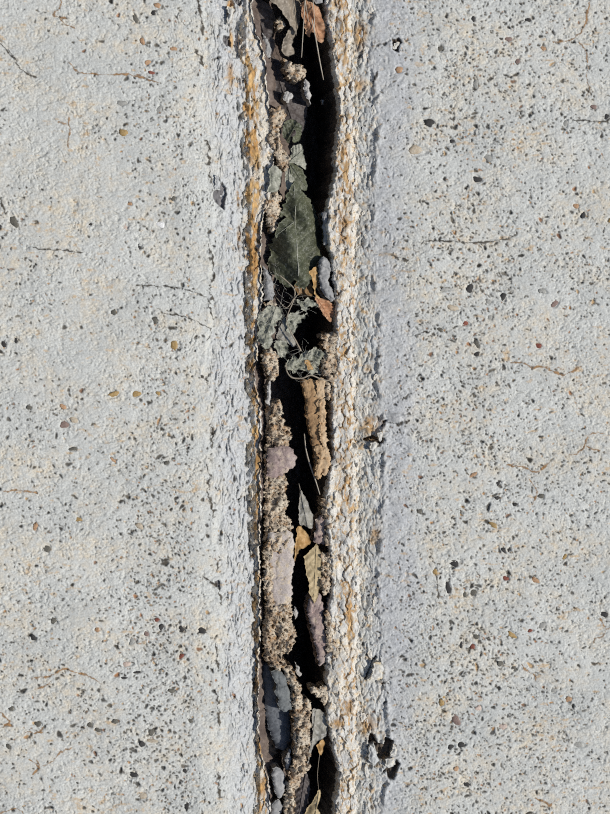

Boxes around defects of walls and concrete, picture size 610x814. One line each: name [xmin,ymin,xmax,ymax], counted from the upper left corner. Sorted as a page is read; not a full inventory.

crack [250,0,341,814]
spalling [322,0,398,814]